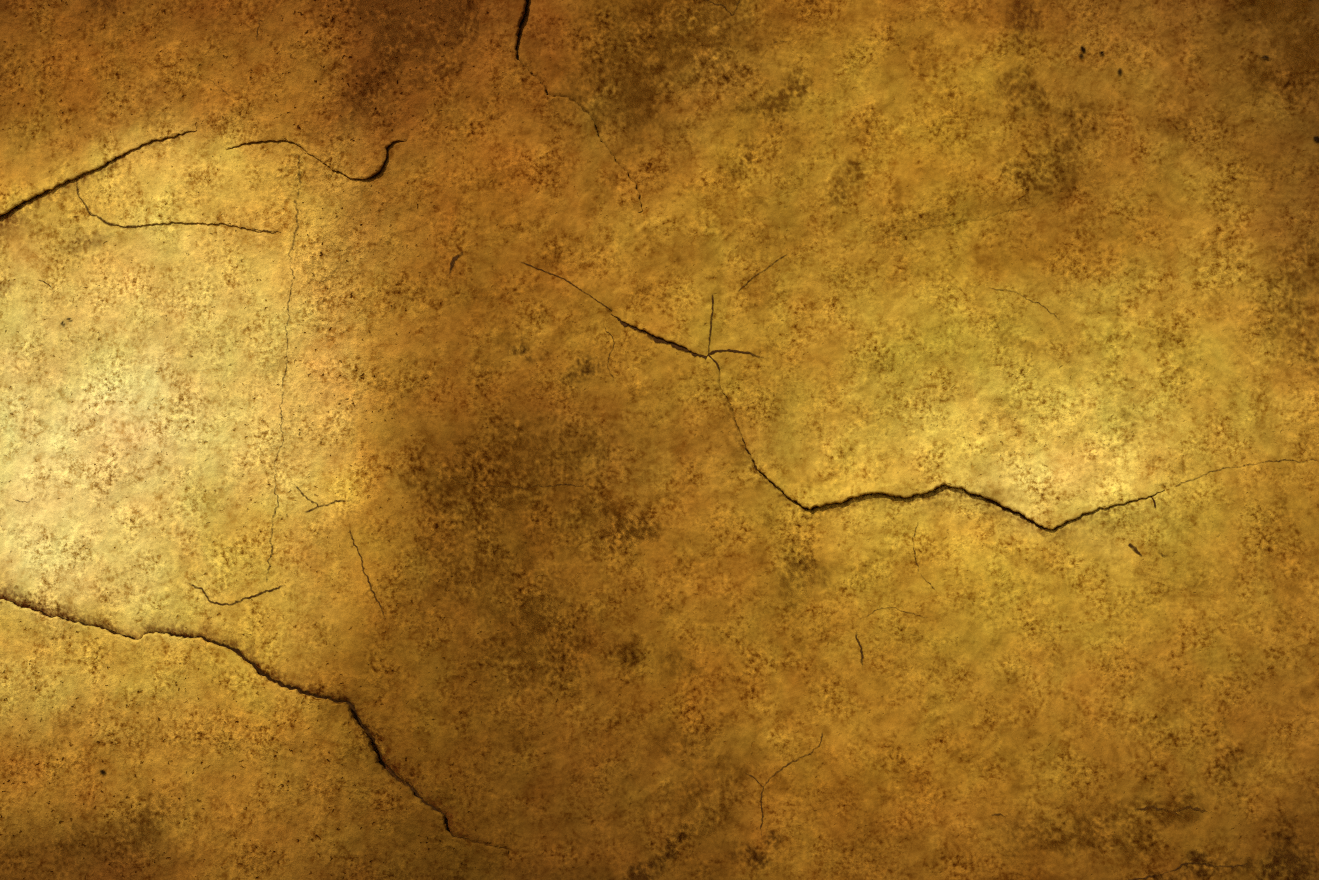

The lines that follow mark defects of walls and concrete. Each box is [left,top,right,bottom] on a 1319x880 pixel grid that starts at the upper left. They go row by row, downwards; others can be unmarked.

crack [76,182,139,227]
crack [337,142,394,180]
crack [468,0,643,212]
crack [522,256,784,376]